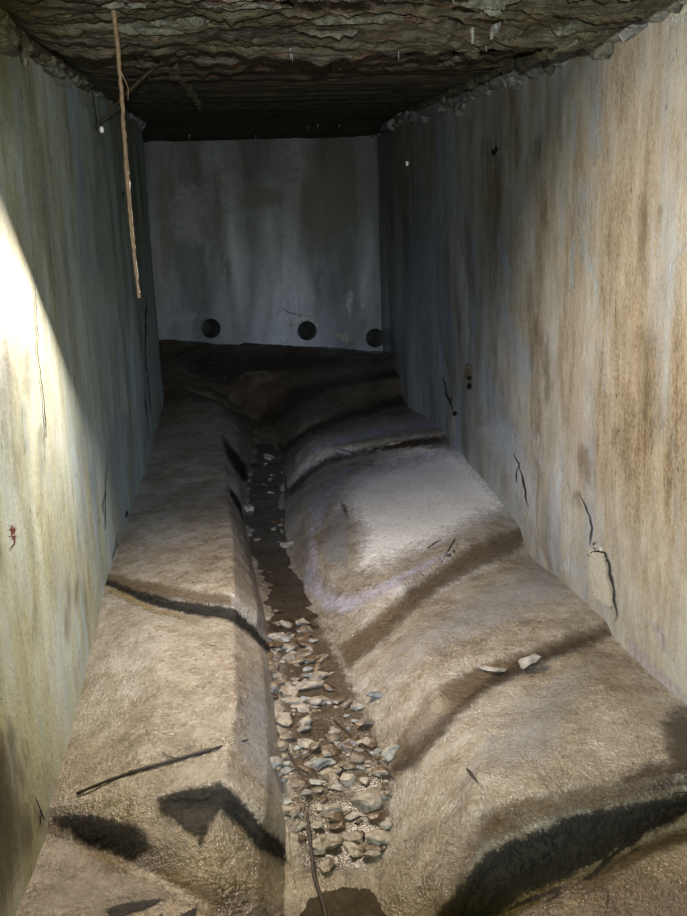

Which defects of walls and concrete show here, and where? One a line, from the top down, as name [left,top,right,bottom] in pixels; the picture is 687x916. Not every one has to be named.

spalling [0,8,146,130]
spalling [96,0,147,9]
spalling [117,0,294,36]
spalling [300,14,425,40]
spalling [370,0,687,138]
crack [33,269,47,460]
crack [102,469,119,559]
leakage [483,419,543,533]
crack [513,453,529,507]
crack [580,496,617,621]
leakage [446,644,687,885]
leakage [463,830,570,916]